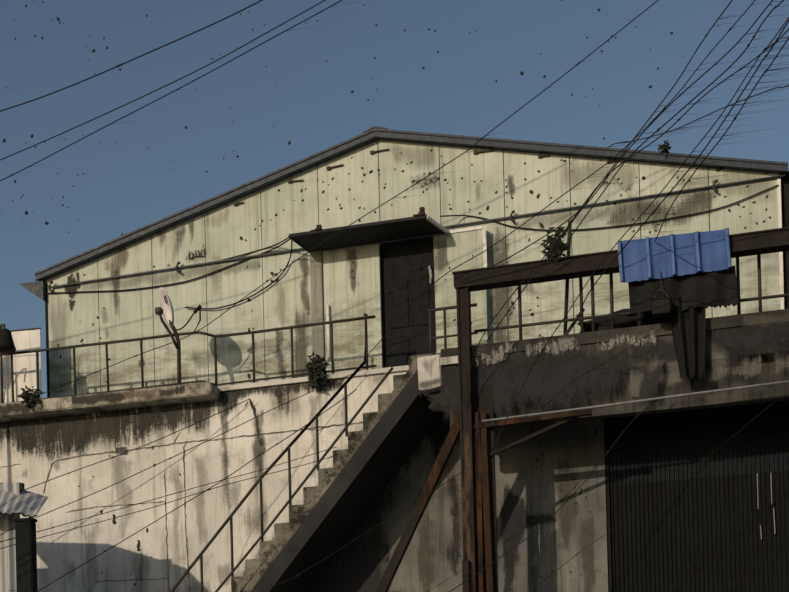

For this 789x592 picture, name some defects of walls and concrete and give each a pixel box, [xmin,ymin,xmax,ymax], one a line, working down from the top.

water stain [347,249,360,290]
water stain [0,256,313,475]
water stain [327,378,345,390]
peeling [475,343,512,364]
peeling [526,338,577,355]
peeling [600,331,656,350]
rust [417,411,460,507]
water stain [429,412,450,459]
water stain [447,476,462,573]
water stain [418,513,436,592]